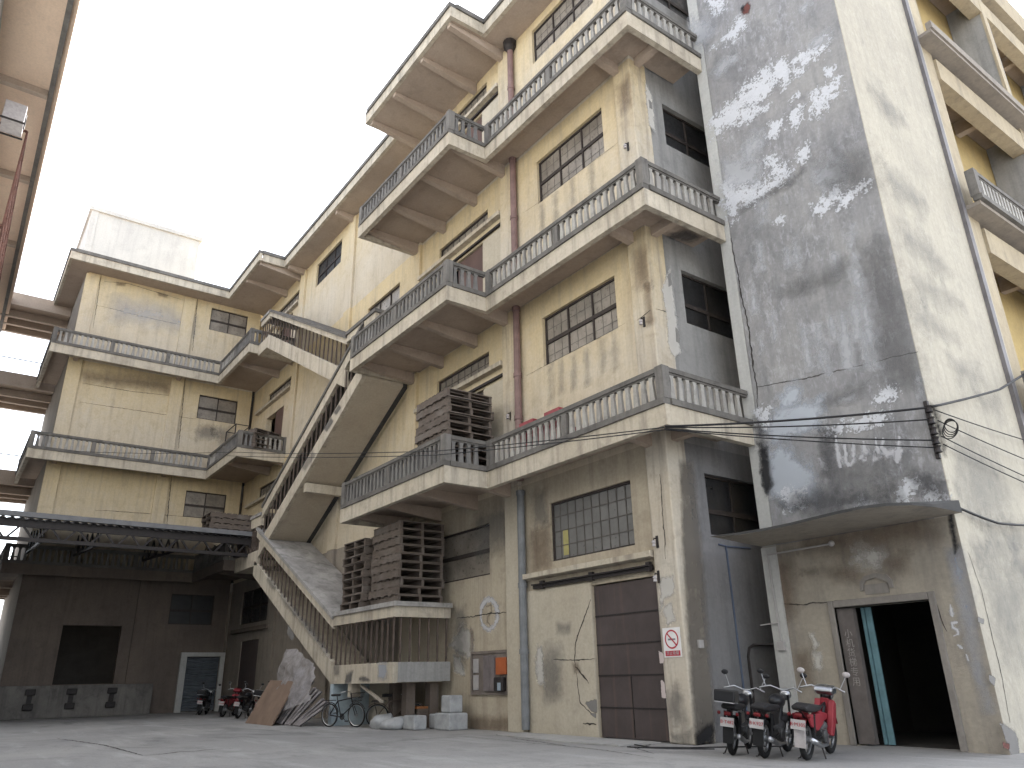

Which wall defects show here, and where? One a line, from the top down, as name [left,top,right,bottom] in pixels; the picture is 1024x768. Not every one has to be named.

peeling [690,0,748,76]
peeling [706,32,847,228]
peeling [808,159,874,219]
peeling [662,270,680,356]
crack [731,241,916,409]
water stain [757,424,773,494]
water stain [785,491,891,511]
water stain [917,475,944,497]
peeling [660,576,676,625]
crack [553,599,596,725]